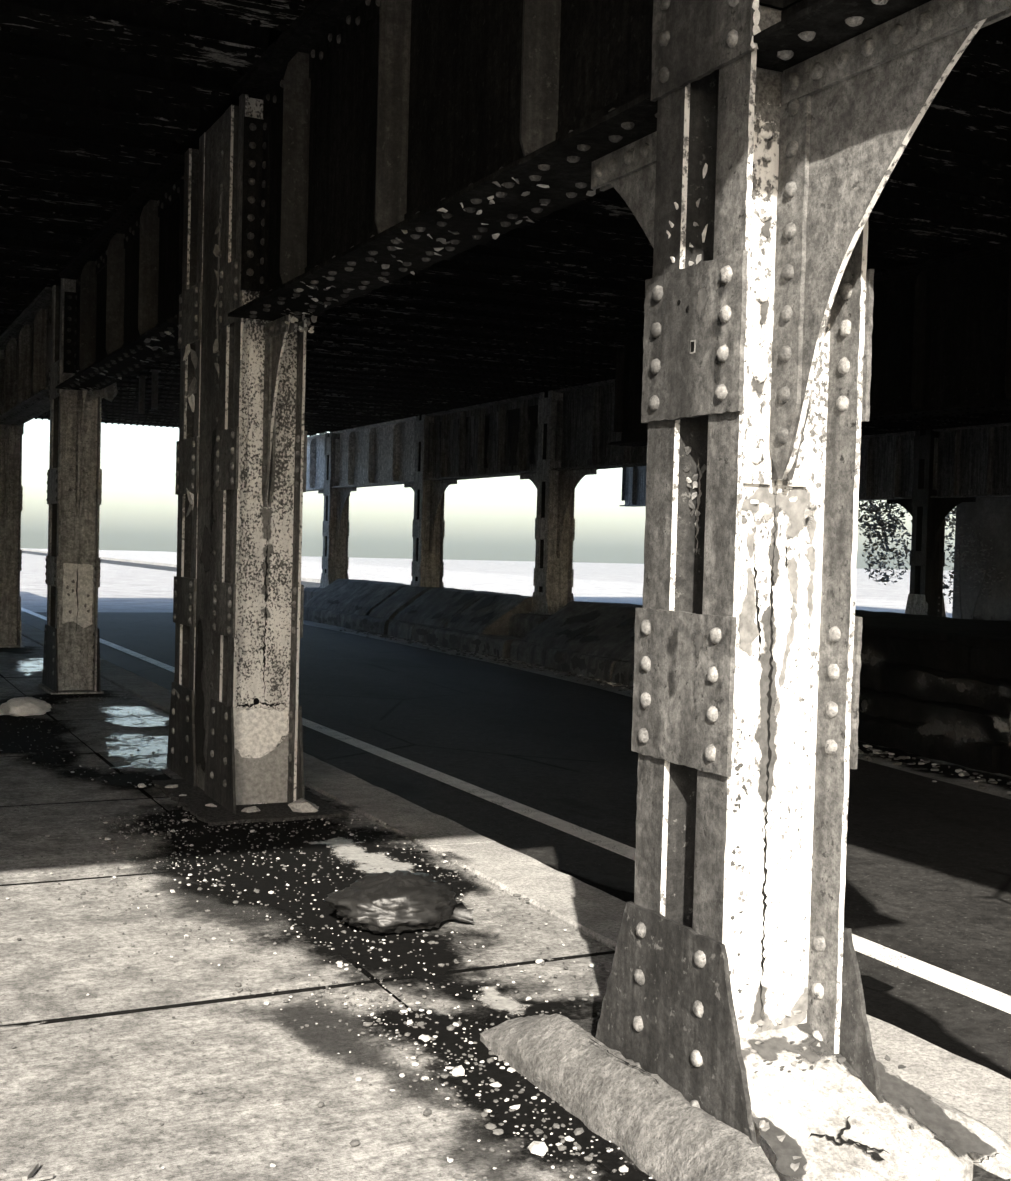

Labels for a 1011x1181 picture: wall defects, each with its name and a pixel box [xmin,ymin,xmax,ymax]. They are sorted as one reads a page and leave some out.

peeling [738,484,818,663]
spalling [916,686,1011,745]
peeling [733,724,755,813]
peeling [731,846,745,935]
water stain [0,690,657,1181]
water stain [861,975,1011,1079]
crack [810,1116,890,1161]